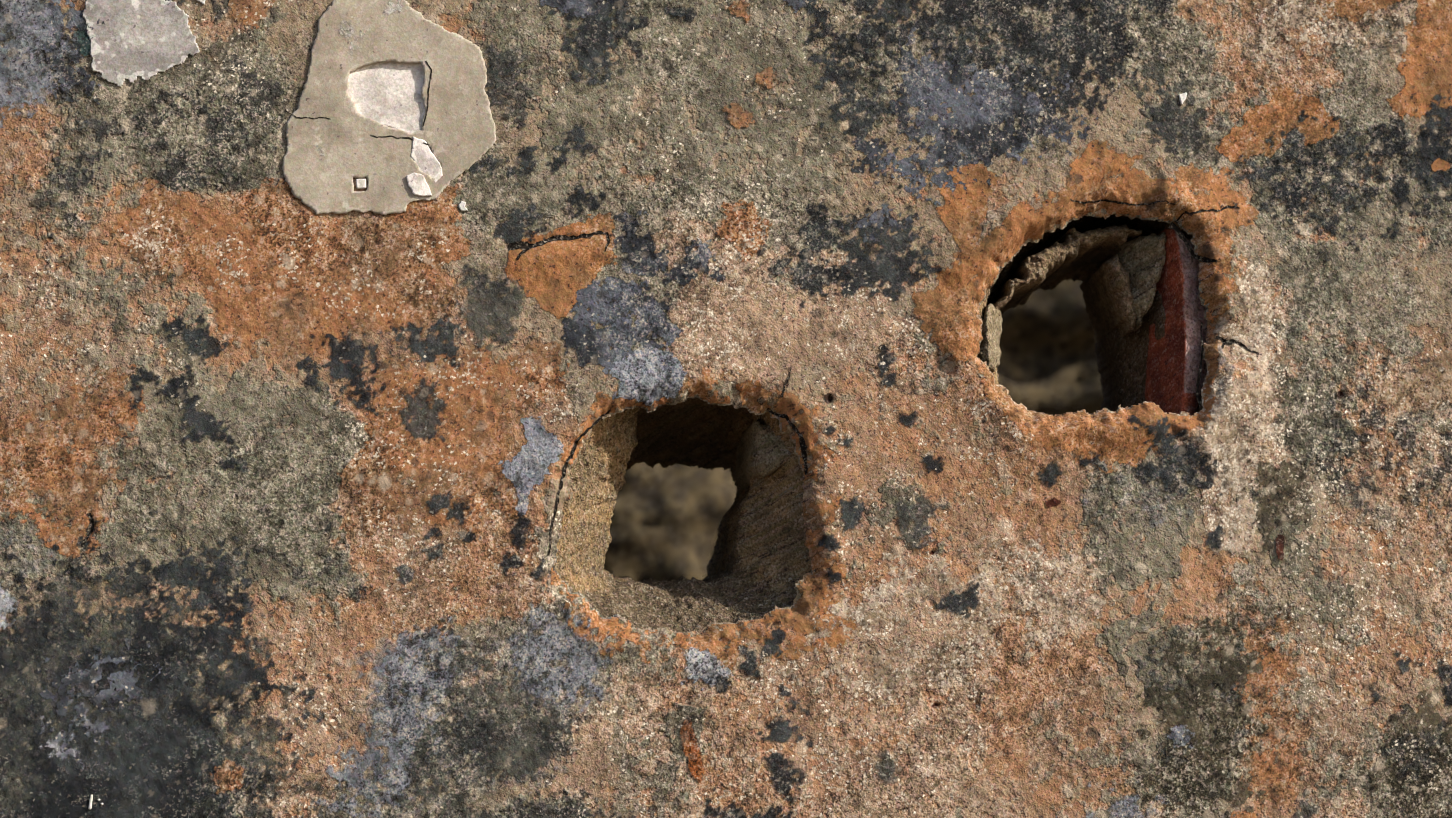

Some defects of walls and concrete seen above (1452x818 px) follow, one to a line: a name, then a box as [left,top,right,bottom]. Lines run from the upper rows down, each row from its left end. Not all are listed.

peeling [82,0,205,87]
peeling [228,0,275,29]
peeling [107,62,570,545]
peeling [505,212,617,319]
damp [664,1,701,22]
damp [751,0,1452,314]
spalling [912,0,1452,557]
damp [0,493,620,818]
spalling [551,367,1115,725]
damp [1394,648,1452,706]